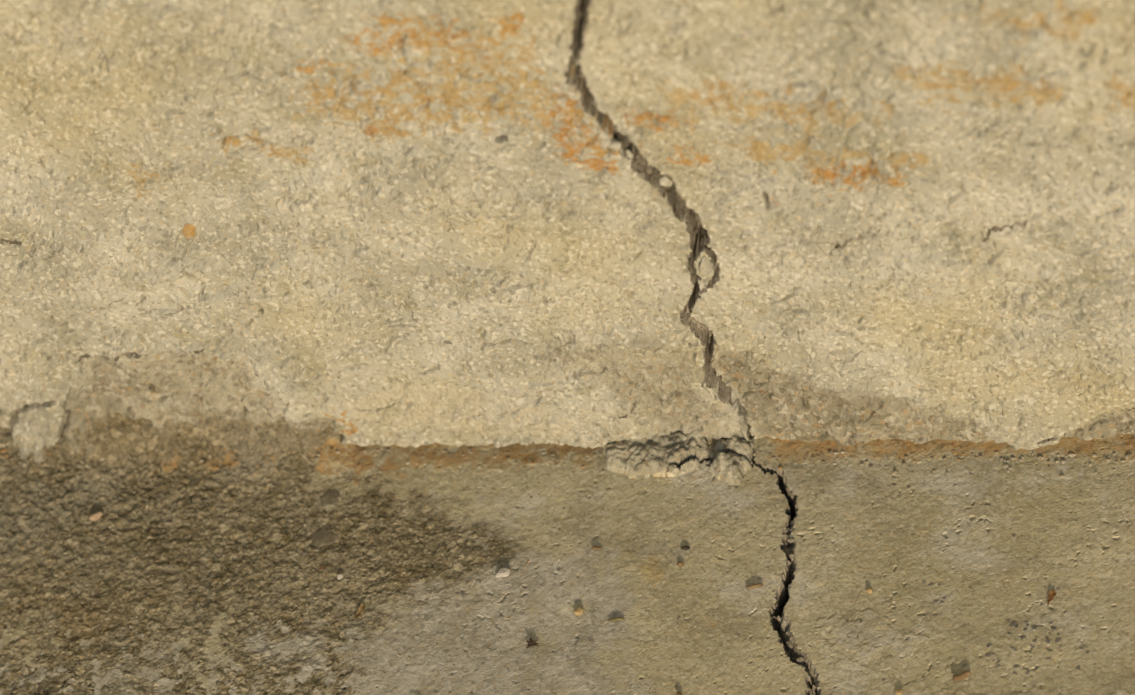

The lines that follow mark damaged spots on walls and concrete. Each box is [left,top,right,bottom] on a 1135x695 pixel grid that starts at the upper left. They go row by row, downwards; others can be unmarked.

leakage [293,372,583,445]
crack [563,0,821,695]
leakage [0,427,700,695]